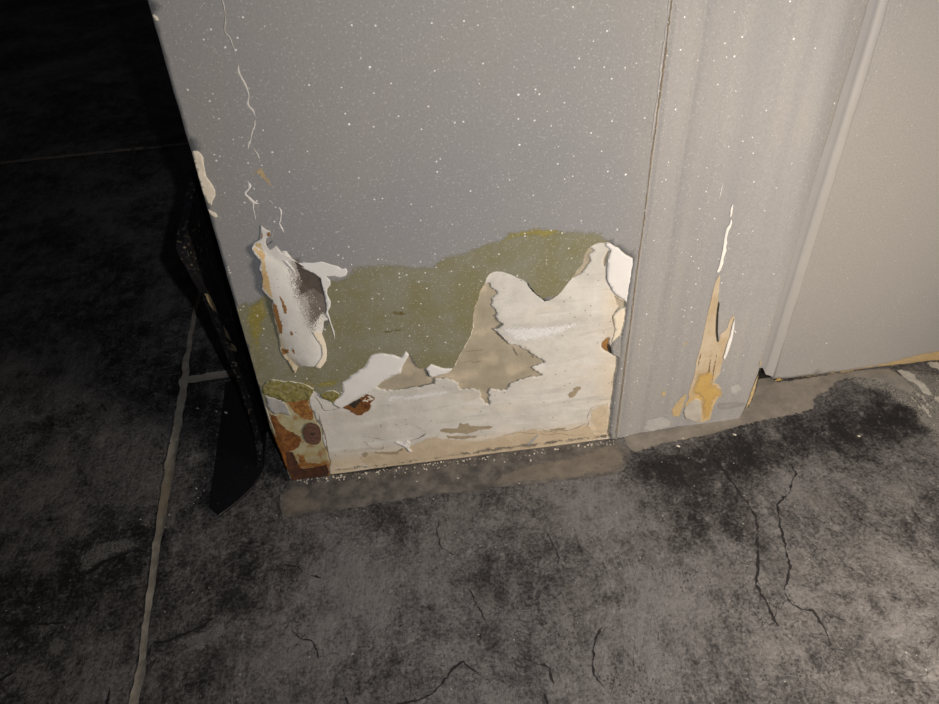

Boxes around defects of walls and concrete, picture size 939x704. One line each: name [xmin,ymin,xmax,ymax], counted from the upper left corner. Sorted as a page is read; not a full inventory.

peeling [192,151,217,218]
peeling [252,226,347,373]
water stain [237,227,613,407]
peeling [266,396,290,415]
corrosion [269,414,329,481]
corrosion [287,400,313,420]
peeling [309,242,633,474]
water stain [672,372,722,418]
crack [685,185,833,649]
water stain [802,352,939,378]